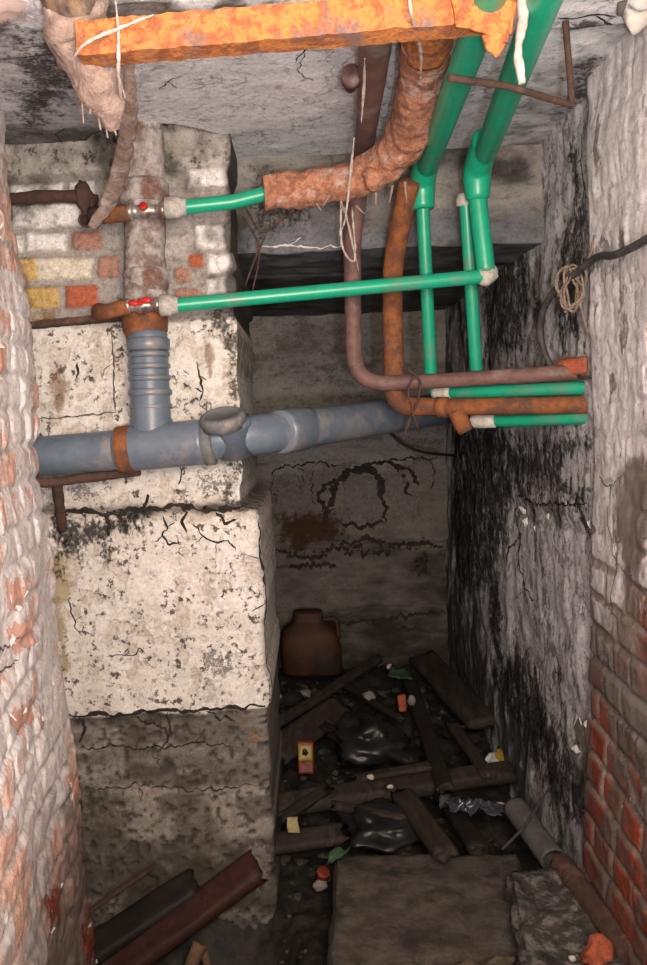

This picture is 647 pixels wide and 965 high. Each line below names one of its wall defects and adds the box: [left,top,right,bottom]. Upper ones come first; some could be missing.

spalling [0,0,36,24]
crack [54,456,445,801]
leakage [451,425,593,832]